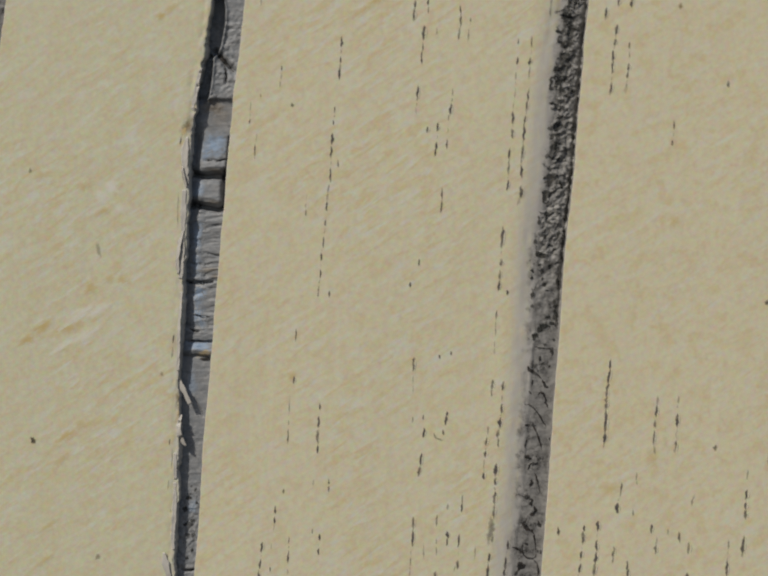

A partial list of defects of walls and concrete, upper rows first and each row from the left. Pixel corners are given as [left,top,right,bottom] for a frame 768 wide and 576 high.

peeling [175,68,202,279]
peeling [169,292,192,447]
leakage [512,0,585,576]